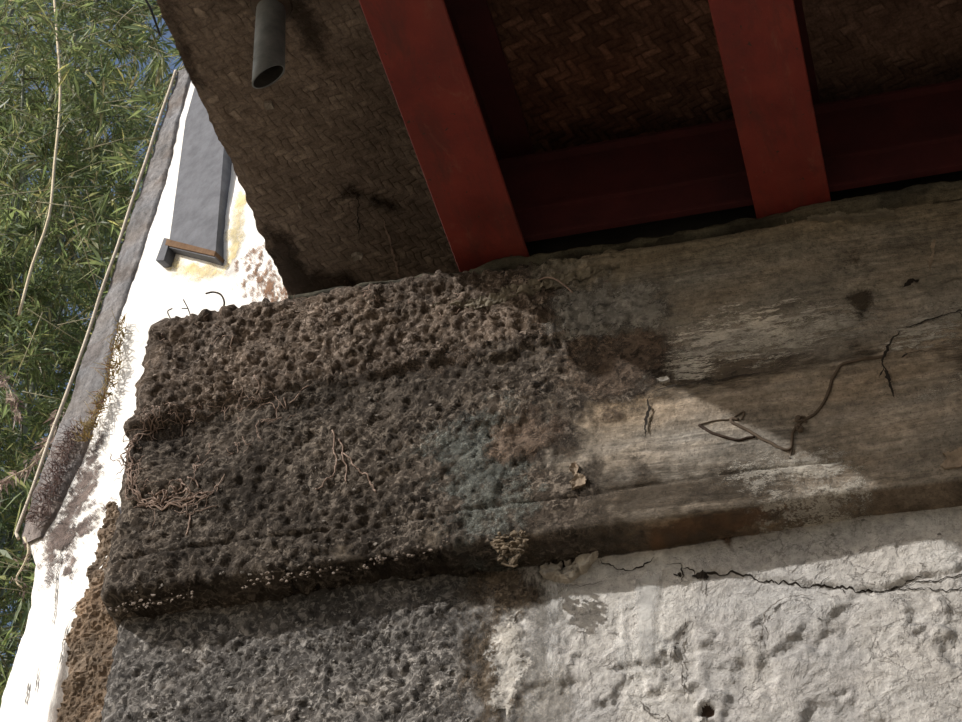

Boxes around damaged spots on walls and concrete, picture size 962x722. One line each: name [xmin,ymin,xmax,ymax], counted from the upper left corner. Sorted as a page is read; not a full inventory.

crack [844,309,962,397]
damp [459,565,560,722]
flaking render [539,551,599,584]
damp [617,571,662,670]
crack [640,618,686,722]
crack [565,557,962,662]